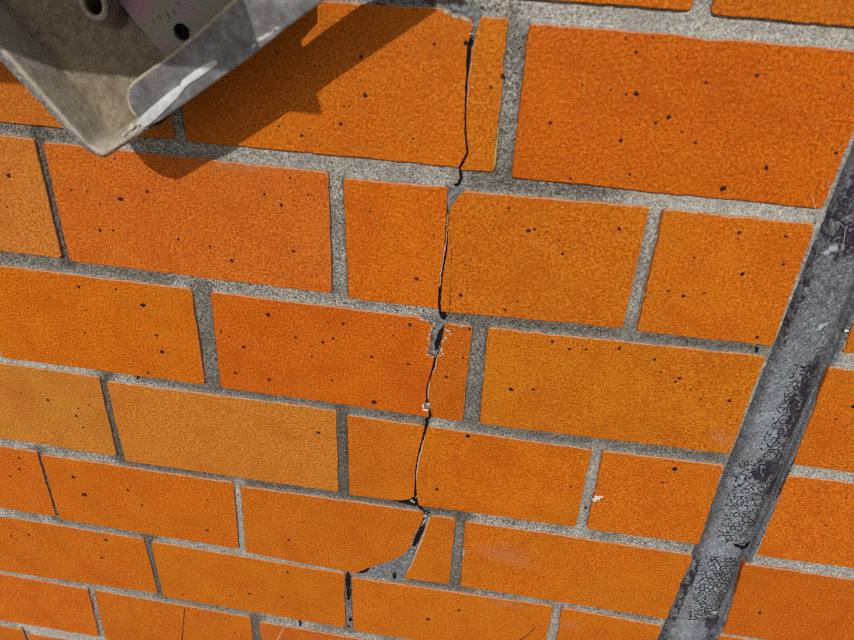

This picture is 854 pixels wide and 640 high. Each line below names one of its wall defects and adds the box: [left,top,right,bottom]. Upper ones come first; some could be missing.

crack [407,37,476,572]
spalling [419,315,465,358]
spalling [354,496,431,580]